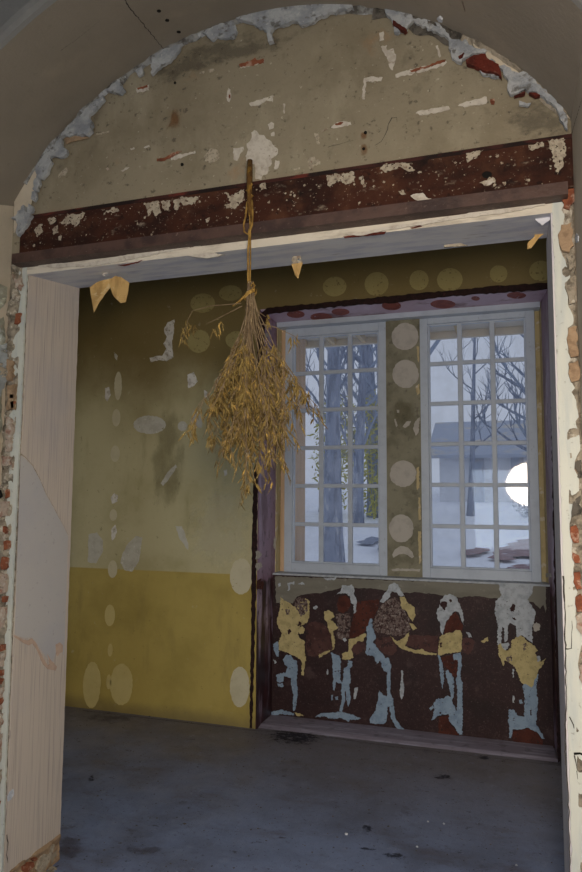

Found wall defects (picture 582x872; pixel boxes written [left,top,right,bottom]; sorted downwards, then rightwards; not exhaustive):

flaking render [11,4,570,240]
peeling [39,246,223,268]
flaking render [150,320,175,362]
spalling [0,264,61,872]
peeling [271,577,546,745]
flaking render [343,188,582,872]